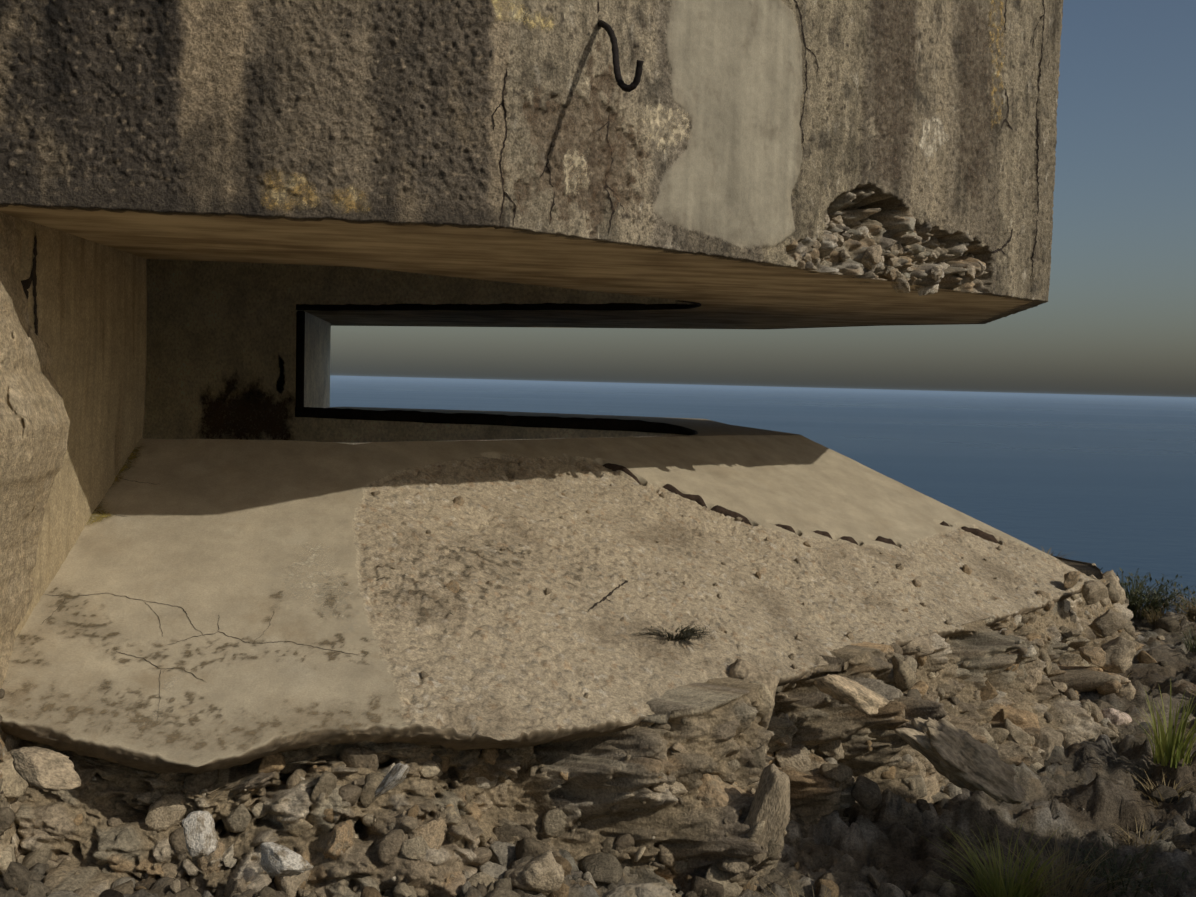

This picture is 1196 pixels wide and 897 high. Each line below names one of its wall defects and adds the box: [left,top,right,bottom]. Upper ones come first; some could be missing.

crack [492,67,516,226]
crack [539,143,555,222]
corrosion [556,37,645,208]
spalling [784,182,993,296]
crack [990,0,1045,279]
crack [43,593,362,719]
spalling [351,453,1099,740]